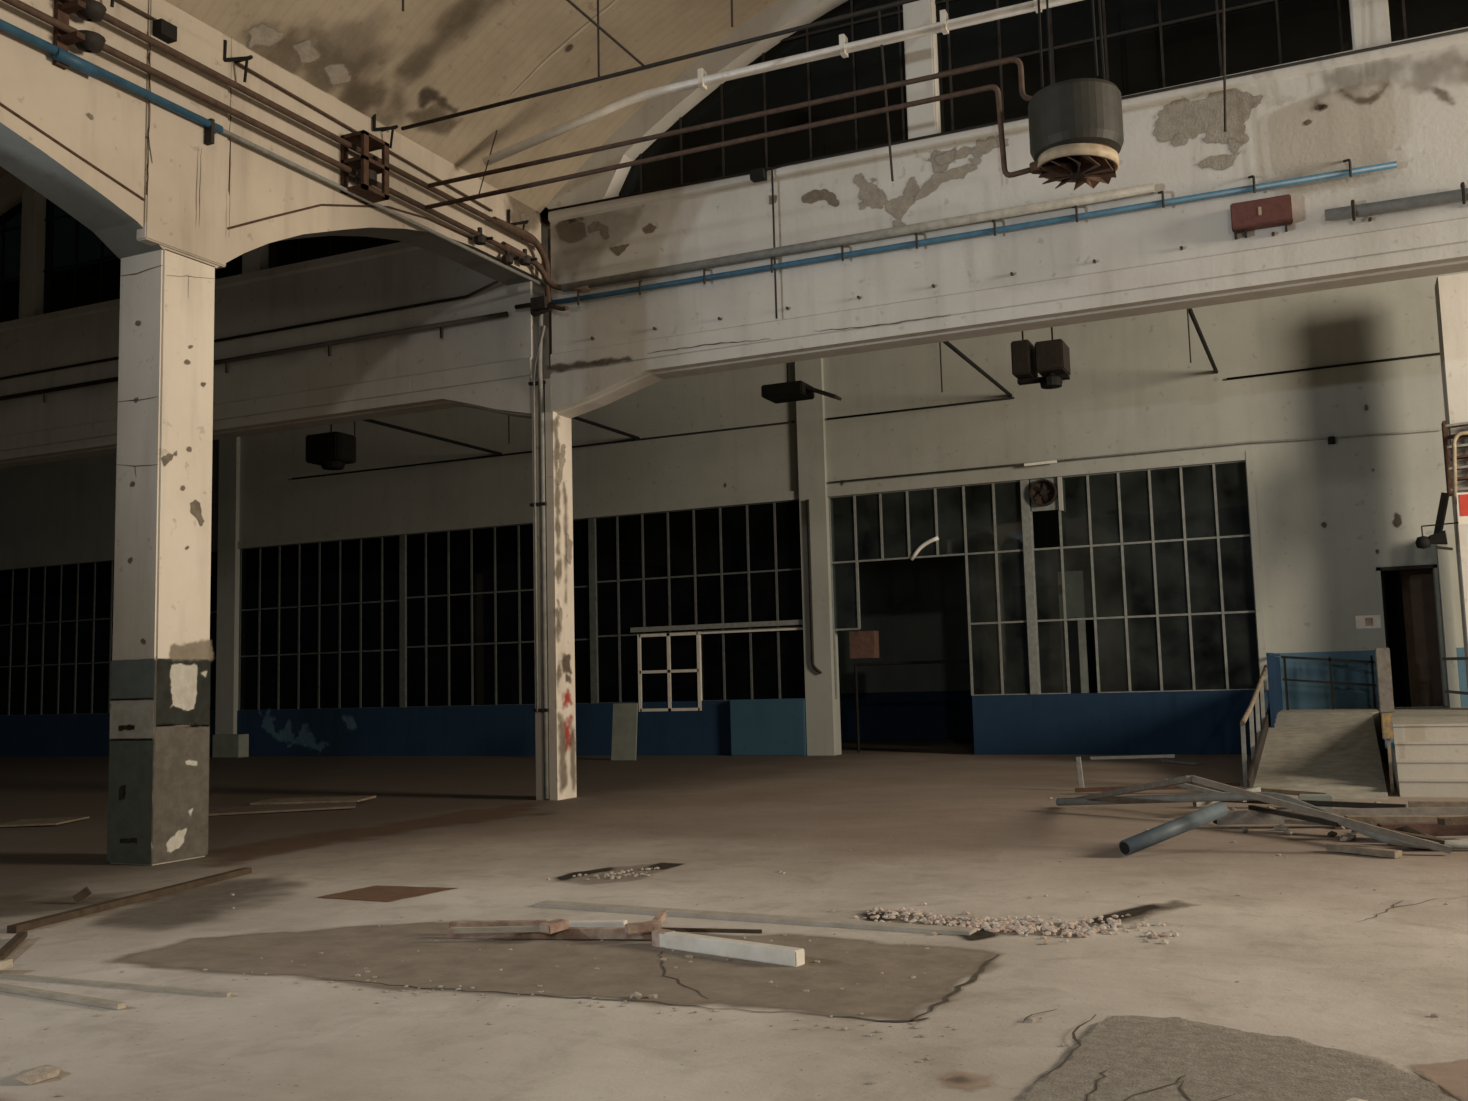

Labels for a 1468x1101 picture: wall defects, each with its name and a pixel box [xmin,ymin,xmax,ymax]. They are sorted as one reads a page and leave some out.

water stain [261,0,480,132]
crack [145,31,153,195]
peeling [1153,88,1263,170]
spalling [556,217,629,256]
spalling [802,189,839,207]
peeling [853,136,1008,227]
peeling [558,444,566,484]
peeling [170,663,207,711]